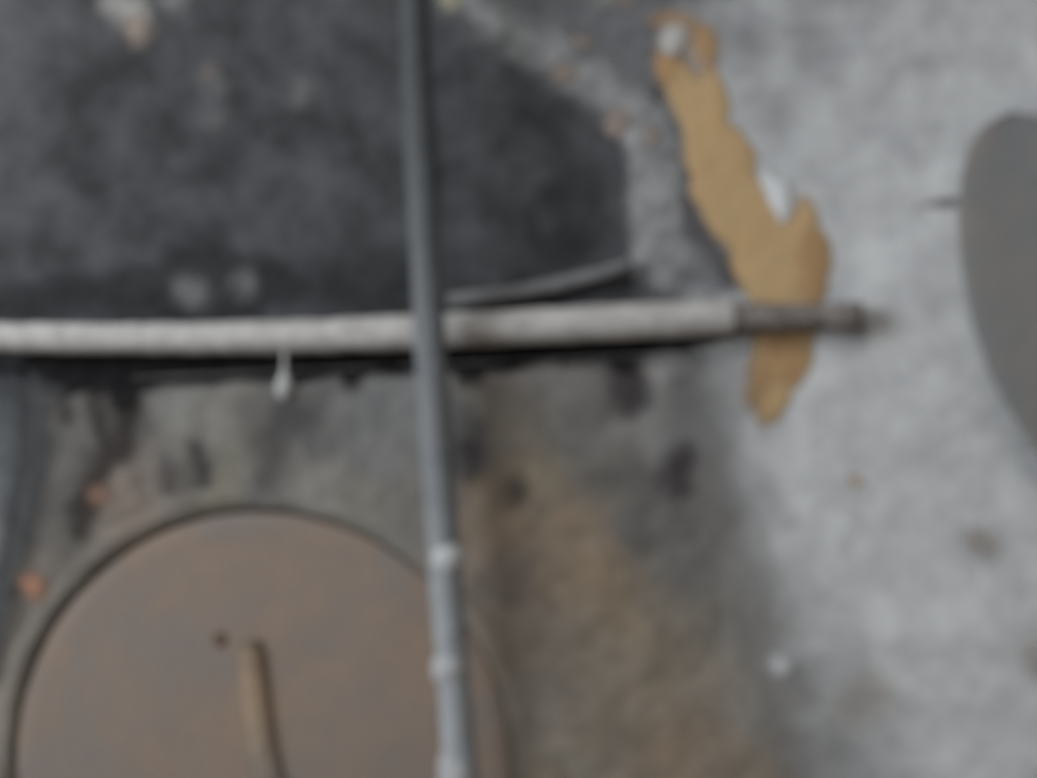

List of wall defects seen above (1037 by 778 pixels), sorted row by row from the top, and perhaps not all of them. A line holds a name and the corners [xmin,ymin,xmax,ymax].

peeling [657,15,831,304]
damp [0,269,173,318]
damp [219,257,412,316]
peeling [746,329,813,425]